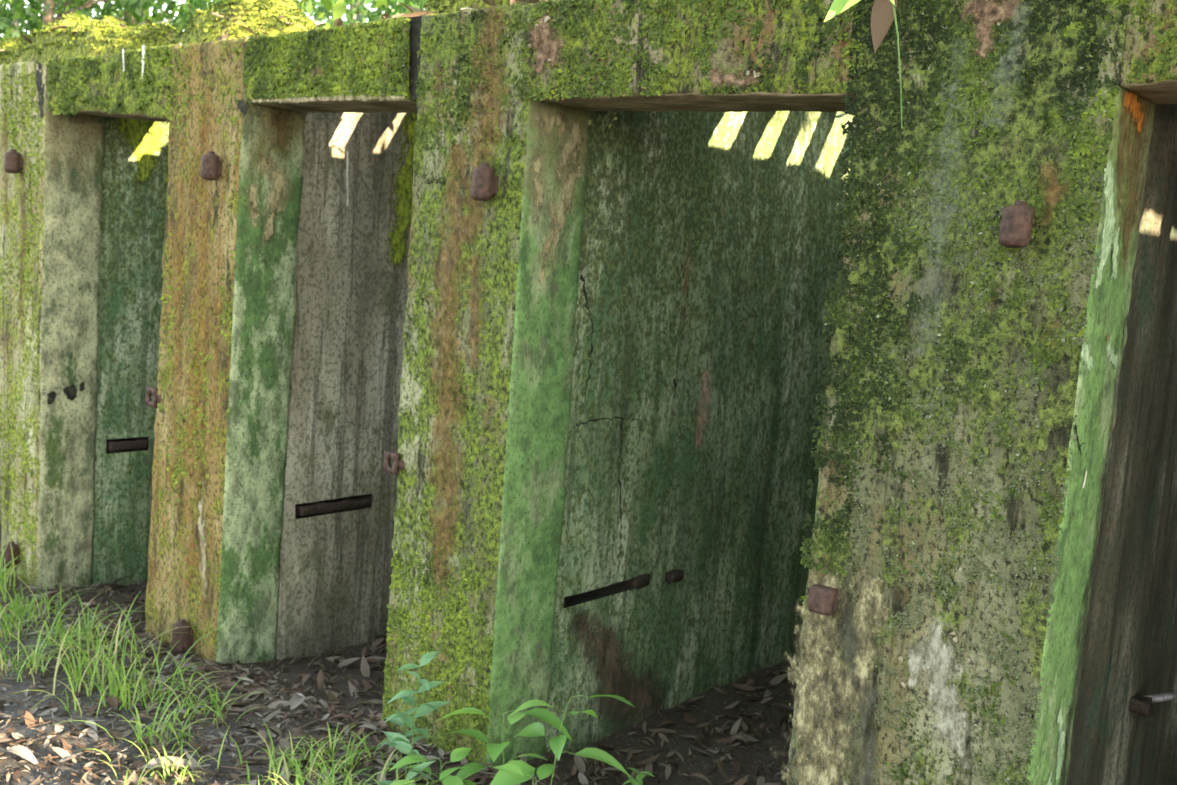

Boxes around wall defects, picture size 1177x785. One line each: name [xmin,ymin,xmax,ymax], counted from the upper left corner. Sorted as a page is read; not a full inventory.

corrosion [1124,91,1144,133]
crack [576,275,645,564]